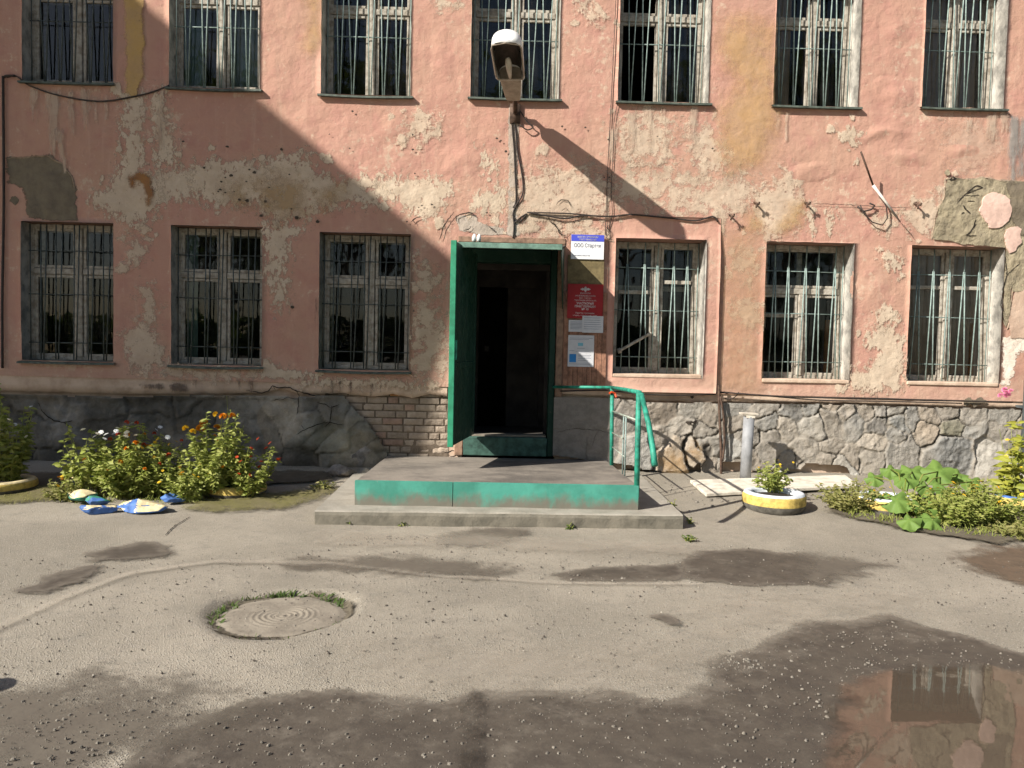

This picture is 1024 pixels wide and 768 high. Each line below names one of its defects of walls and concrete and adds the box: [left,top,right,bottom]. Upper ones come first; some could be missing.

crack [248,385,342,435]
peeling [6,80,840,457]
peeling [835,302,910,397]
flaking render [862,117,1024,386]